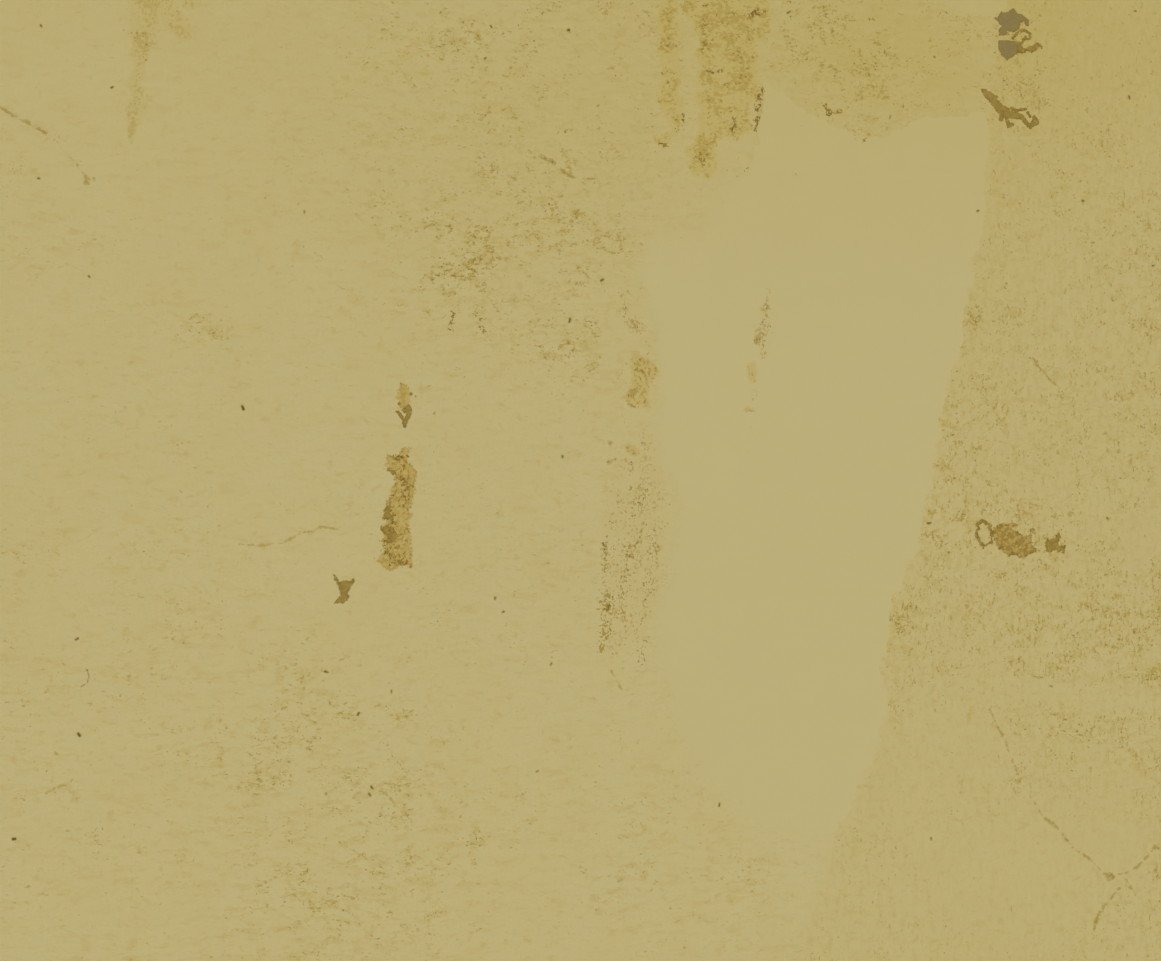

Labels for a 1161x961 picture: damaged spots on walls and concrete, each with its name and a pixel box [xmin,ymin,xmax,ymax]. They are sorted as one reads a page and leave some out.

damp [116,0,212,151]
damp [647,0,777,187]
peeling [765,0,1065,149]
flaking render [330,571,357,606]
flaking render [371,379,420,574]
flaking render [975,517,1066,562]